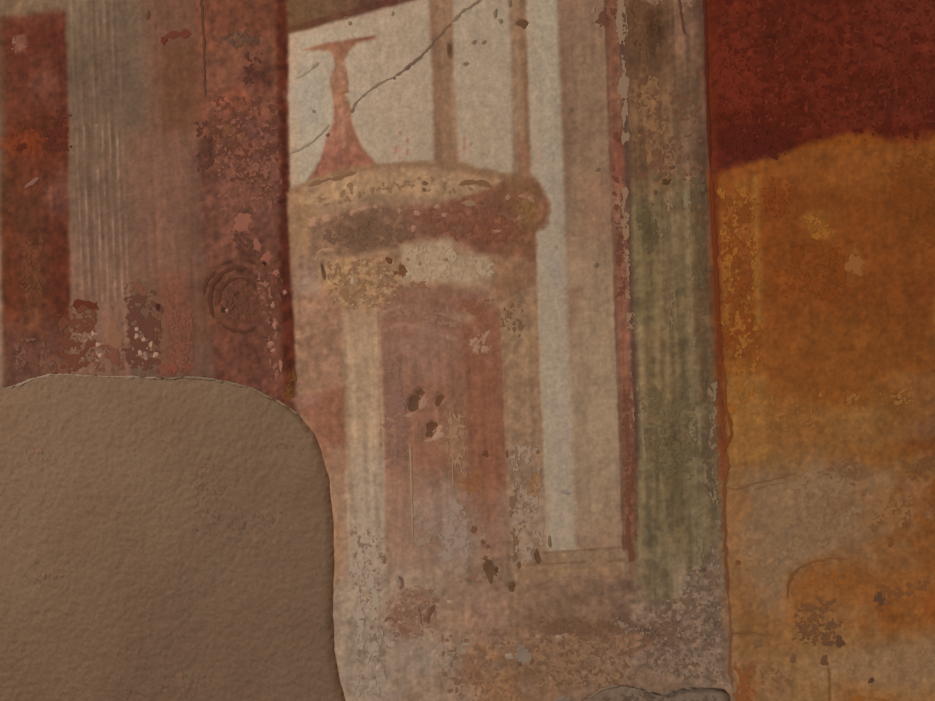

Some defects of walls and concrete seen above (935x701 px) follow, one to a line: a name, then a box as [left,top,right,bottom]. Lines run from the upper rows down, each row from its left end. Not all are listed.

crack [352,0,481,110]
crack [290,125,329,154]
peeling [592,0,706,240]
peeling [193,90,287,383]
peeling [13,290,164,374]
spalling [404,388,444,418]
peeling [424,412,467,482]
peeling [438,167,762,701]
peeling [350,527,452,680]
spalling [785,596,845,665]